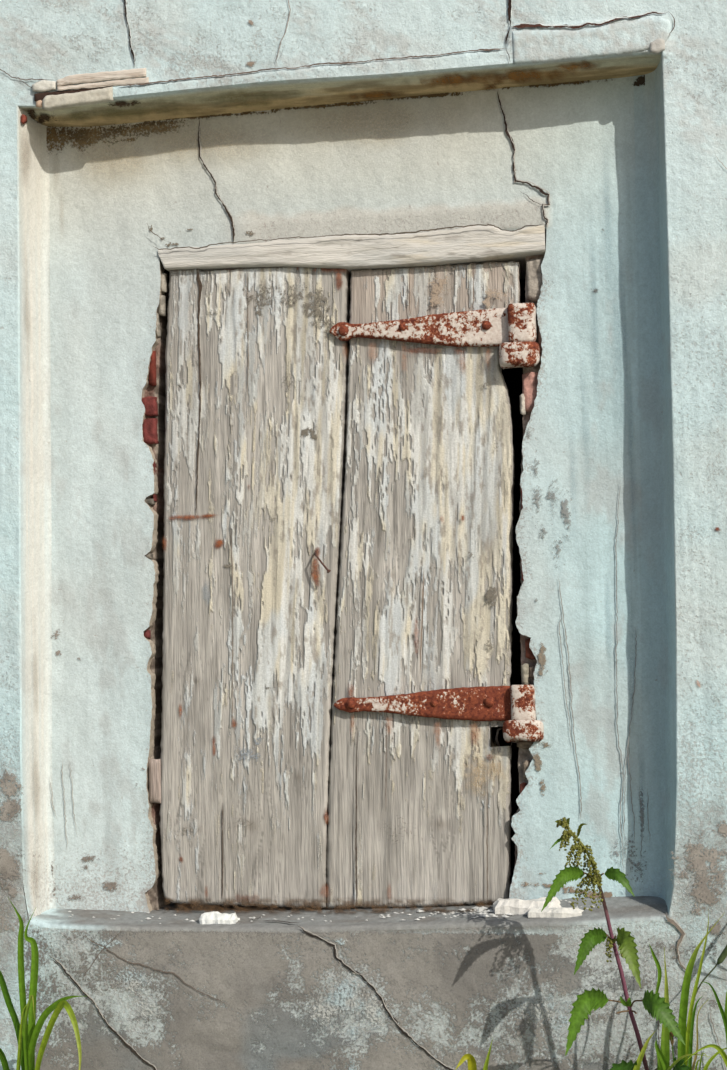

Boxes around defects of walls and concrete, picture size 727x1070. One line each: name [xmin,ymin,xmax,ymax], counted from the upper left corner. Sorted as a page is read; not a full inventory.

crack [0,69,46,88]
water stain [53,62,607,147]
crack [148,92,550,250]
crack [121,0,675,86]
peeling [141,258,551,890]
crack [50,932,228,1070]
crack [250,915,454,1070]